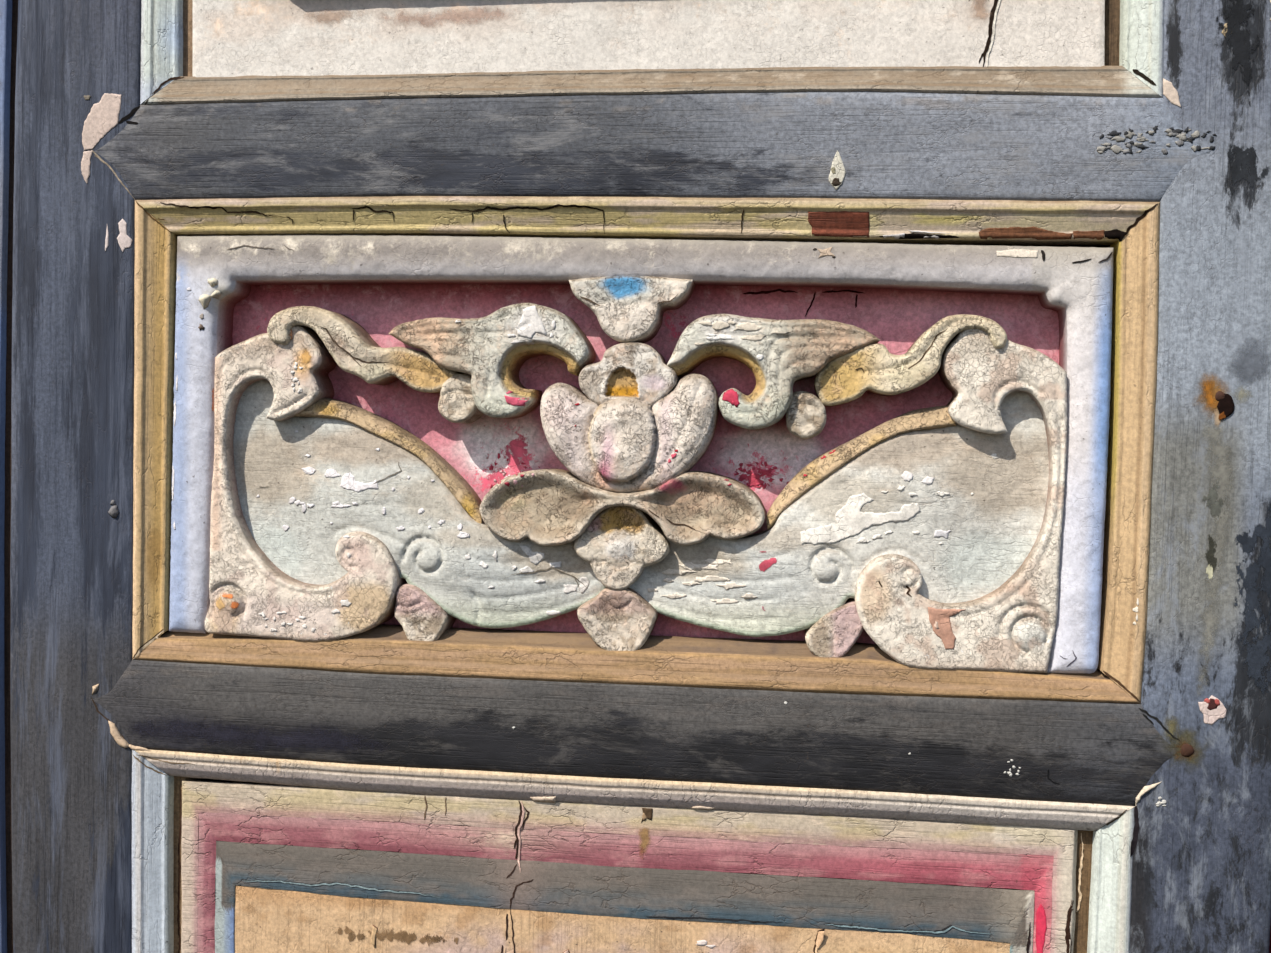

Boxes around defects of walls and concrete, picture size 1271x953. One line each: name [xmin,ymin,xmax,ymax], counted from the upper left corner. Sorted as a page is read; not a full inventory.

crack [979,0,1001,67]
peeling [81,93,121,184]
peeling [1097,126,1269,194]
crack [352,206,394,221]
crack [451,204,605,234]
rust [1199,377,1247,425]
peeling [800,471,950,545]
peeling [928,607,965,650]
spalling [1198,695,1227,725]
crack [501,801,533,953]
crack [1065,806,1139,953]
crack [646,915,780,923]